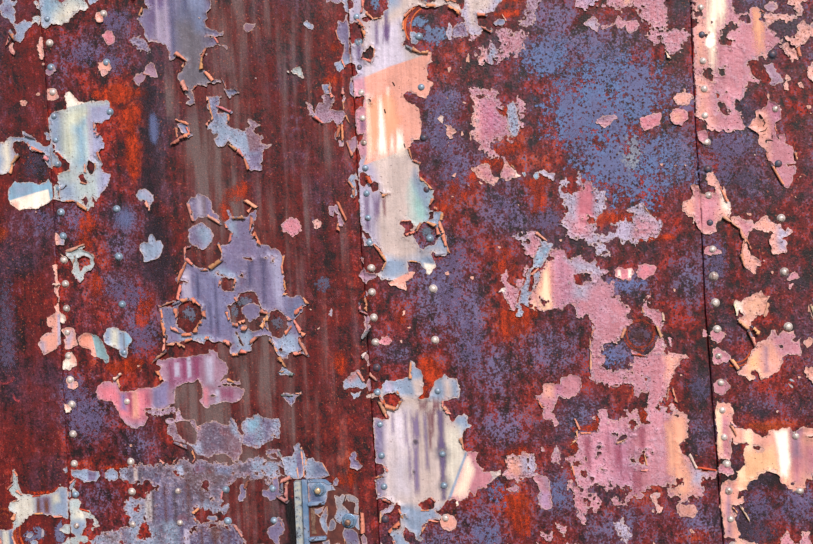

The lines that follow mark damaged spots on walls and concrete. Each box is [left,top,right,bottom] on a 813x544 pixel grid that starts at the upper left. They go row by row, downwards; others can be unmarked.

peeling [0,88,111,213]
rust [93,84,145,179]
peeling [129,0,272,171]
peeling [306,0,541,340]
rust [483,142,525,170]
peeling [575,0,813,188]
peeling [0,193,367,544]
rust [419,357,442,399]
rust [500,306,537,336]
peeling [343,87,813,544]
rust [572,415,599,432]
rust [11,519,66,544]